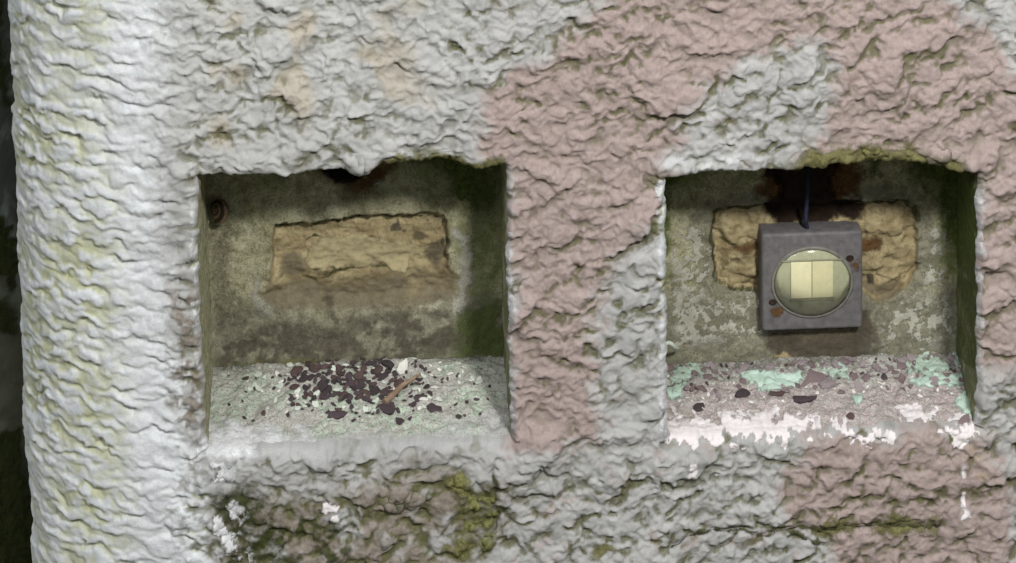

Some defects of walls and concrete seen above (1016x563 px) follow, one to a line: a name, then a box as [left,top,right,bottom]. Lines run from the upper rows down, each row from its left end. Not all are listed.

corrosion [755,163,866,223]
leakage [0,300,17,335]
spalling [251,212,475,316]
spalling [667,204,777,347]
spalling [820,200,980,450]
peeling [664,362,896,451]
leakage [0,428,31,563]